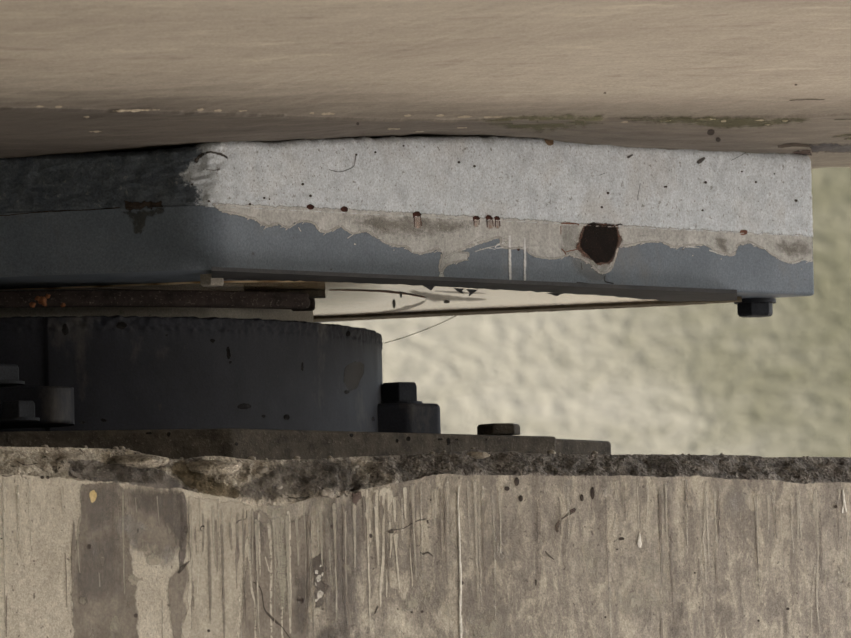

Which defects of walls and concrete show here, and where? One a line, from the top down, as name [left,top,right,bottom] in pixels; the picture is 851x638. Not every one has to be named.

damp [65,460,240,638]
spalling [235,459,374,505]